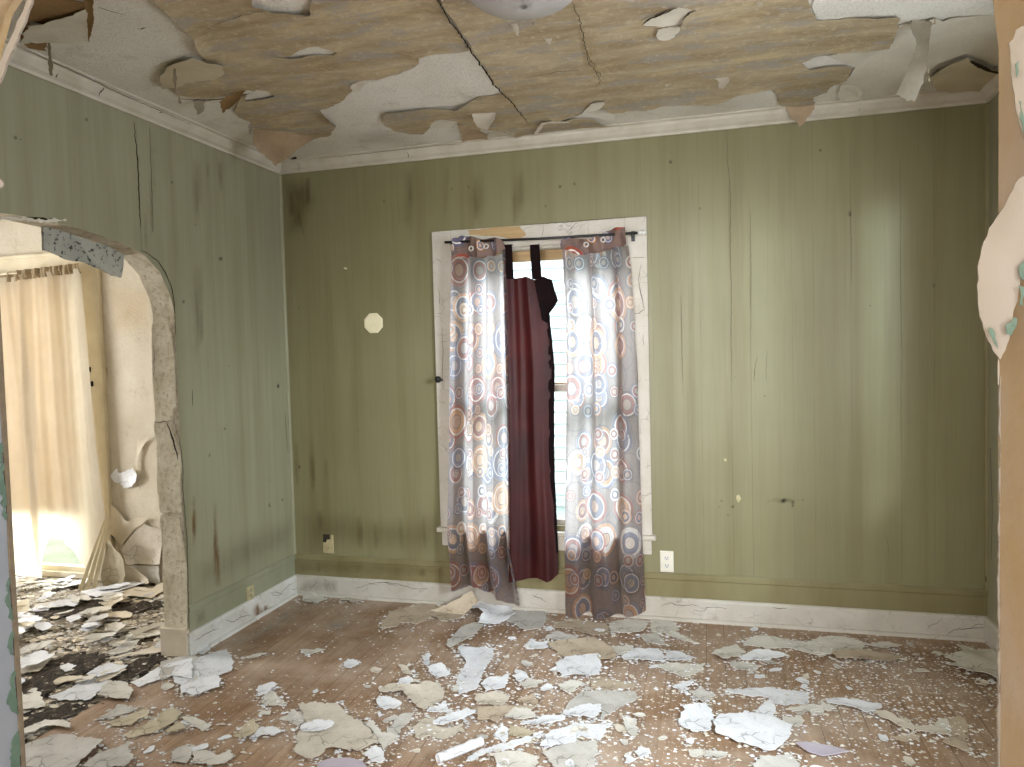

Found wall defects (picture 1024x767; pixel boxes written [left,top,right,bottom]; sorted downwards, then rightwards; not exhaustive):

crack [19,41,250,224]
peeling [173,63,246,115]
peeling [248,124,314,166]
crack [437,0,528,123]
peeling [472,112,496,130]
crack [573,4,603,87]
peeling [812,0,994,103]
peeling [977,175,1024,385]
crack [157,390,193,606]